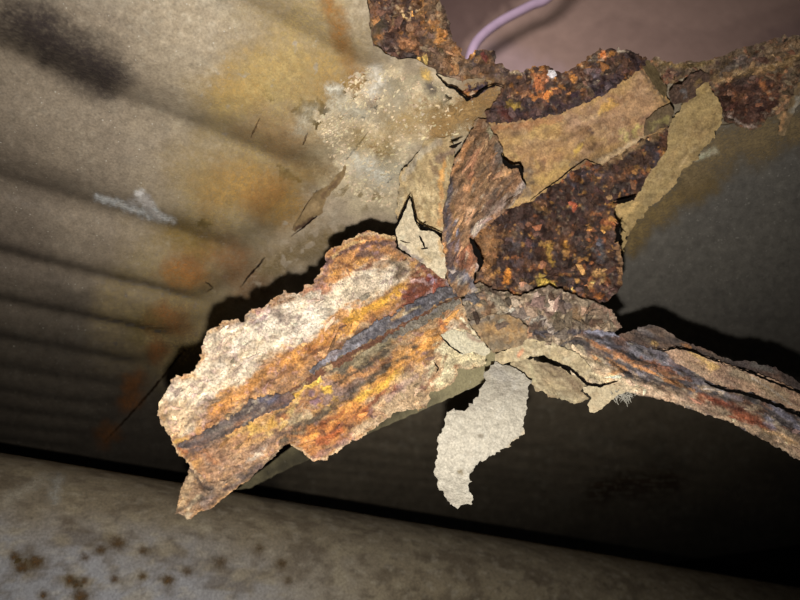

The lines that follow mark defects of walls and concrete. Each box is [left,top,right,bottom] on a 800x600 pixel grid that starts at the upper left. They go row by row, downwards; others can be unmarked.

leakage [0,3,126,90]
leakage [127,191,162,220]
peeling [292,64,477,279]
peeling [489,60,670,208]
peeling [777,82,800,136]
crack [240,257,265,287]
corrosion [157,0,800,520]
crack [104,349,185,442]
peeling [434,358,589,509]
corrosion [67,577,86,600]